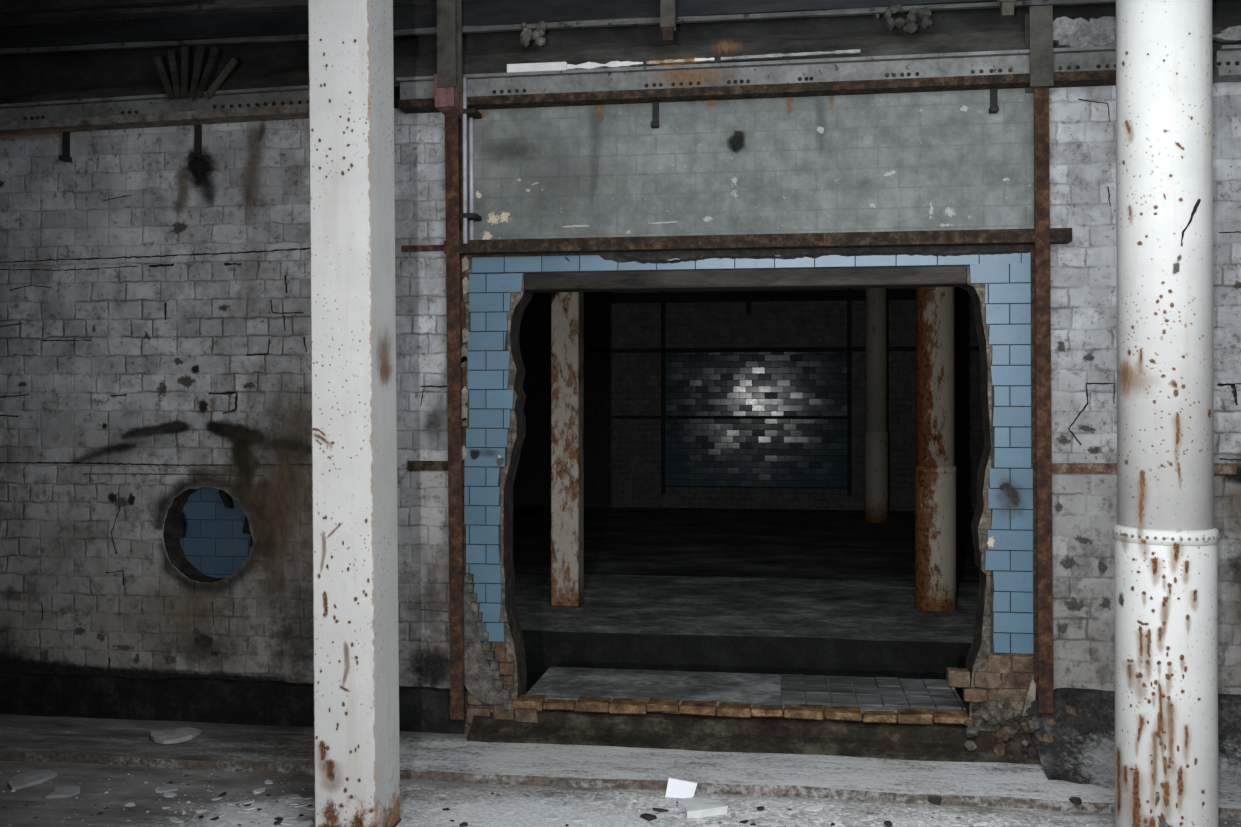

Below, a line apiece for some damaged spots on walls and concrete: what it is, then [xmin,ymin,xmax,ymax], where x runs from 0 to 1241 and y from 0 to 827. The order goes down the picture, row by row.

peeling [1053,16,1116,48]
peeling [1212,26,1241,43]
rust [1123,349,1185,396]
water stain [292,406,312,432]
spalling [470,450,504,465]
spalling [1000,483,1019,508]
water stain [286,593,313,655]
spalling [463,573,539,724]
rust [1117,540,1197,827]
rust [316,736,373,827]